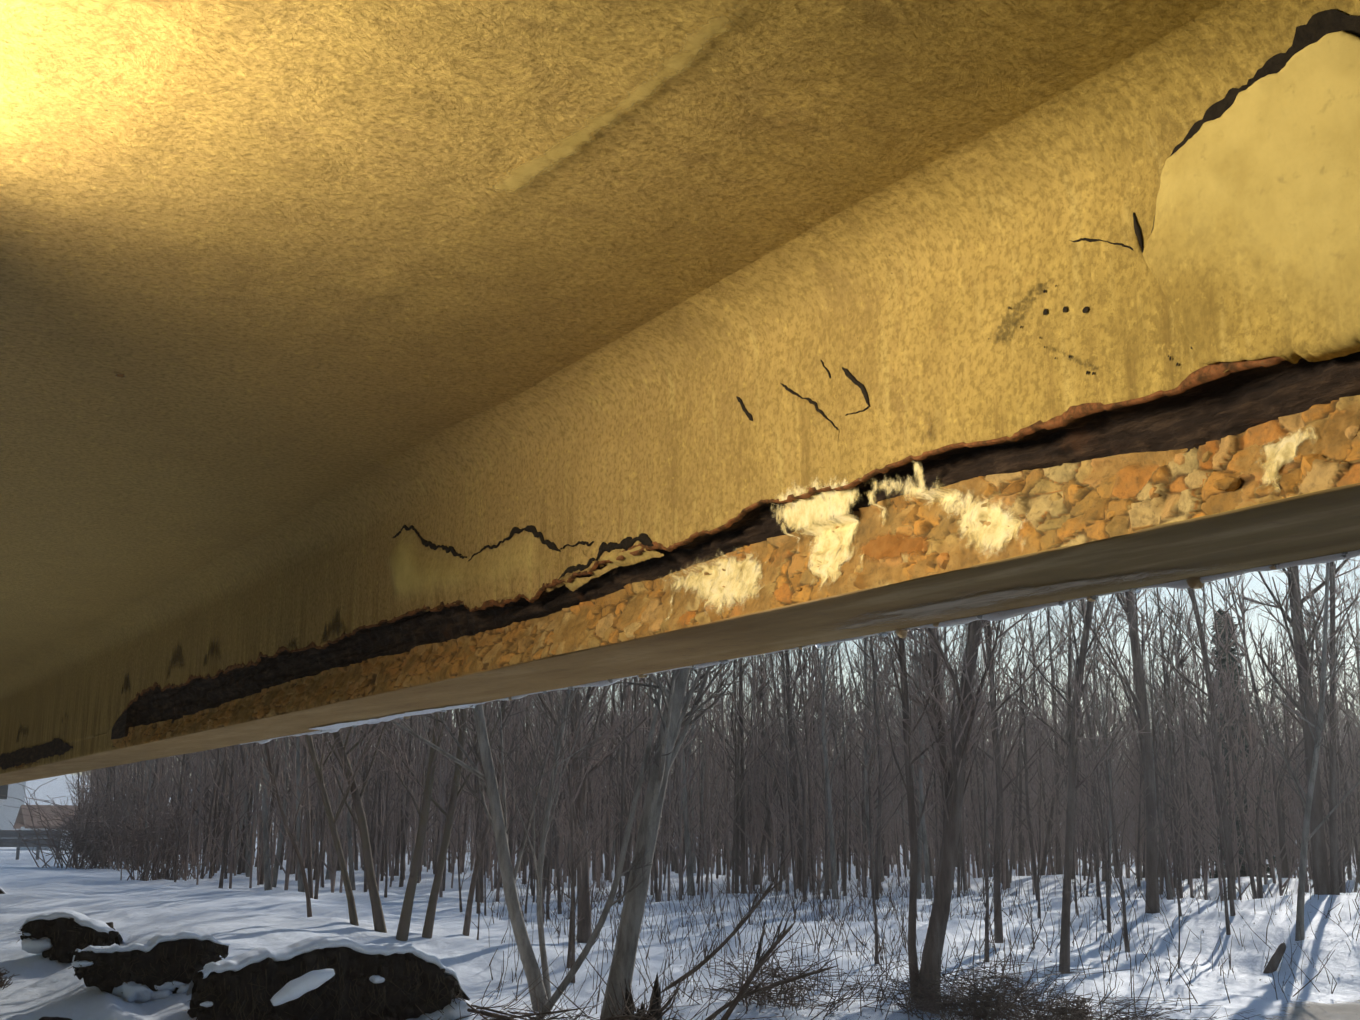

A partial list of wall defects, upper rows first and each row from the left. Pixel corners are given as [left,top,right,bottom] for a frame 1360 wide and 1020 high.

crack [1069,212,1148,271]
spalling [110,9,1360,751]
crack [736,360,871,446]
damp [776,461,1022,586]
damp [665,554,762,619]
spalling [0,738,73,770]